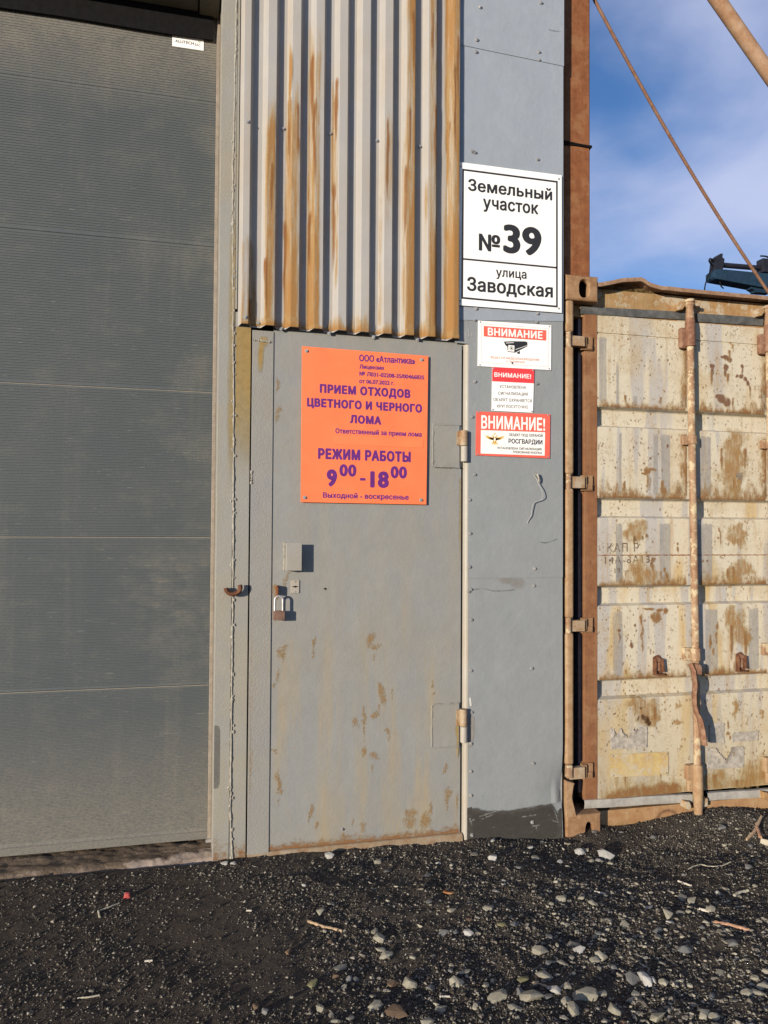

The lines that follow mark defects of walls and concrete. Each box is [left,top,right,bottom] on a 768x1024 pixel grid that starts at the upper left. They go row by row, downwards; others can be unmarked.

corrosion [241,0,460,339]
corrosion [599,349,687,411]
corrosion [700,342,766,415]
corrosion [599,434,687,499]
corrosion [700,431,766,501]
corrosion [599,557,686,586]
corrosion [700,522,766,585]
corrosion [618,608,668,651]
corrosion [700,606,767,676]
corrosion [599,670,686,680]
corrosion [628,695,660,726]
corrosion [601,775,686,799]